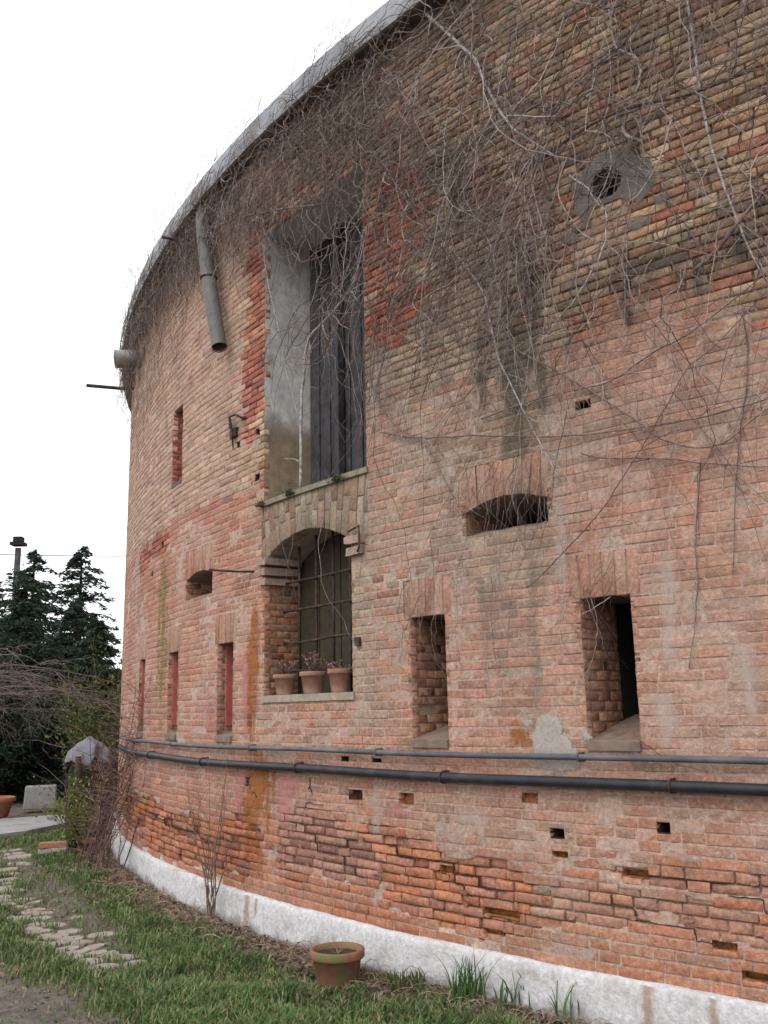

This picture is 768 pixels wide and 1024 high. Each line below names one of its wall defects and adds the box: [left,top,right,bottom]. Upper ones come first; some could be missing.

crack [384,844,506,891]
crack [647,875,768,914]
crack [610,895,737,947]